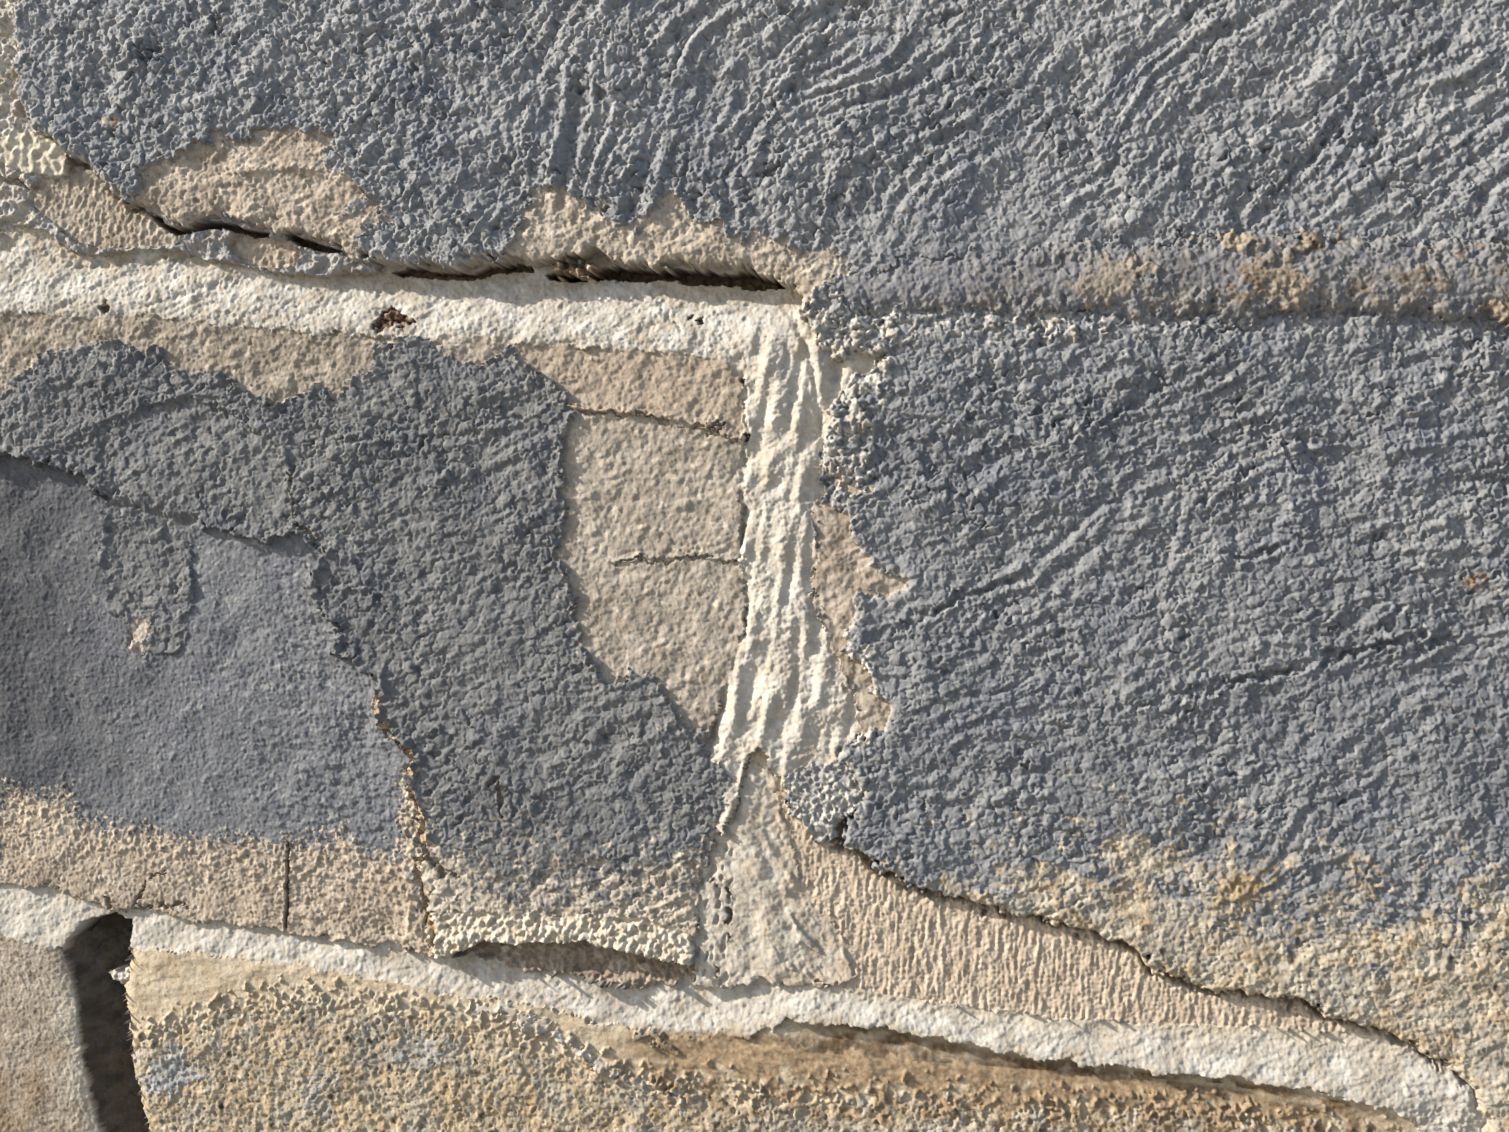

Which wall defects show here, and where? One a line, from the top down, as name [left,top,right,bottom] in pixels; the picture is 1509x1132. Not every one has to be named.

flaking render [0,0,393,279]
crack [153,216,345,255]
crack [398,254,784,291]
peeling [503,185,850,311]
peeling [0,303,417,407]
crack [289,467,326,553]
peeling [432,336,751,732]
peeling [125,616,158,656]
crack [371,690,460,958]
crack [488,777,504,818]
flaking render [0,751,1416,1043]
crack [65,871,190,1132]